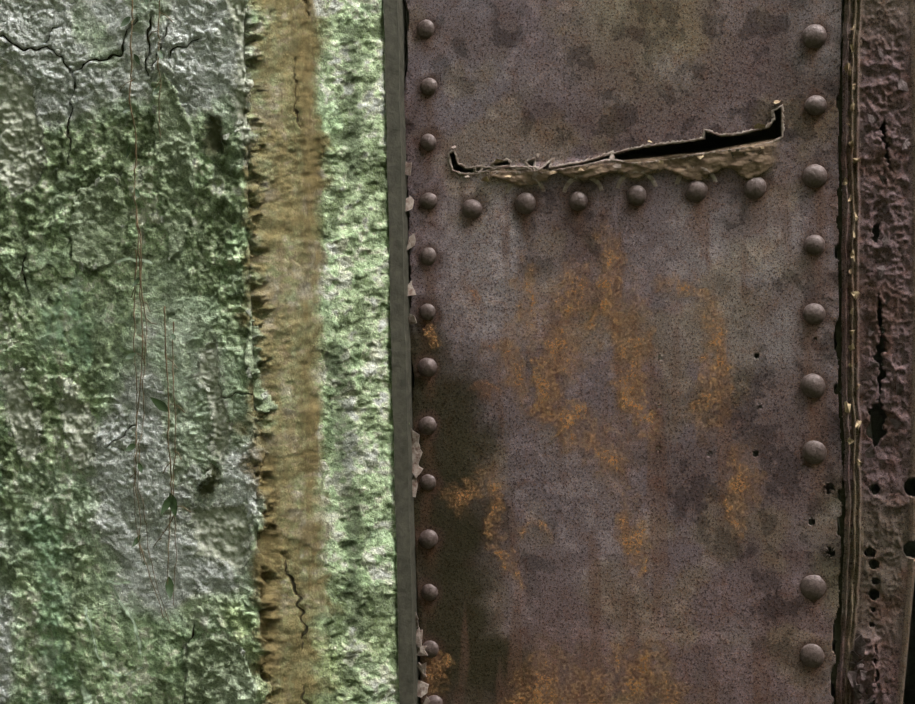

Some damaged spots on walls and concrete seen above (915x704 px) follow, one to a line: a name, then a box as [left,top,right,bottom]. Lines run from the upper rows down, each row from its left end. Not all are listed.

crack [1,18,199,165]
rust [502,245,656,444]
peeling [412,445,423,497]
damp [74,663,92,704]
damp [84,607,143,677]
damp [107,580,141,654]
peeling [415,612,428,656]
peeling [417,680,430,704]
rust [509,659,576,704]
rust [847,635,875,704]